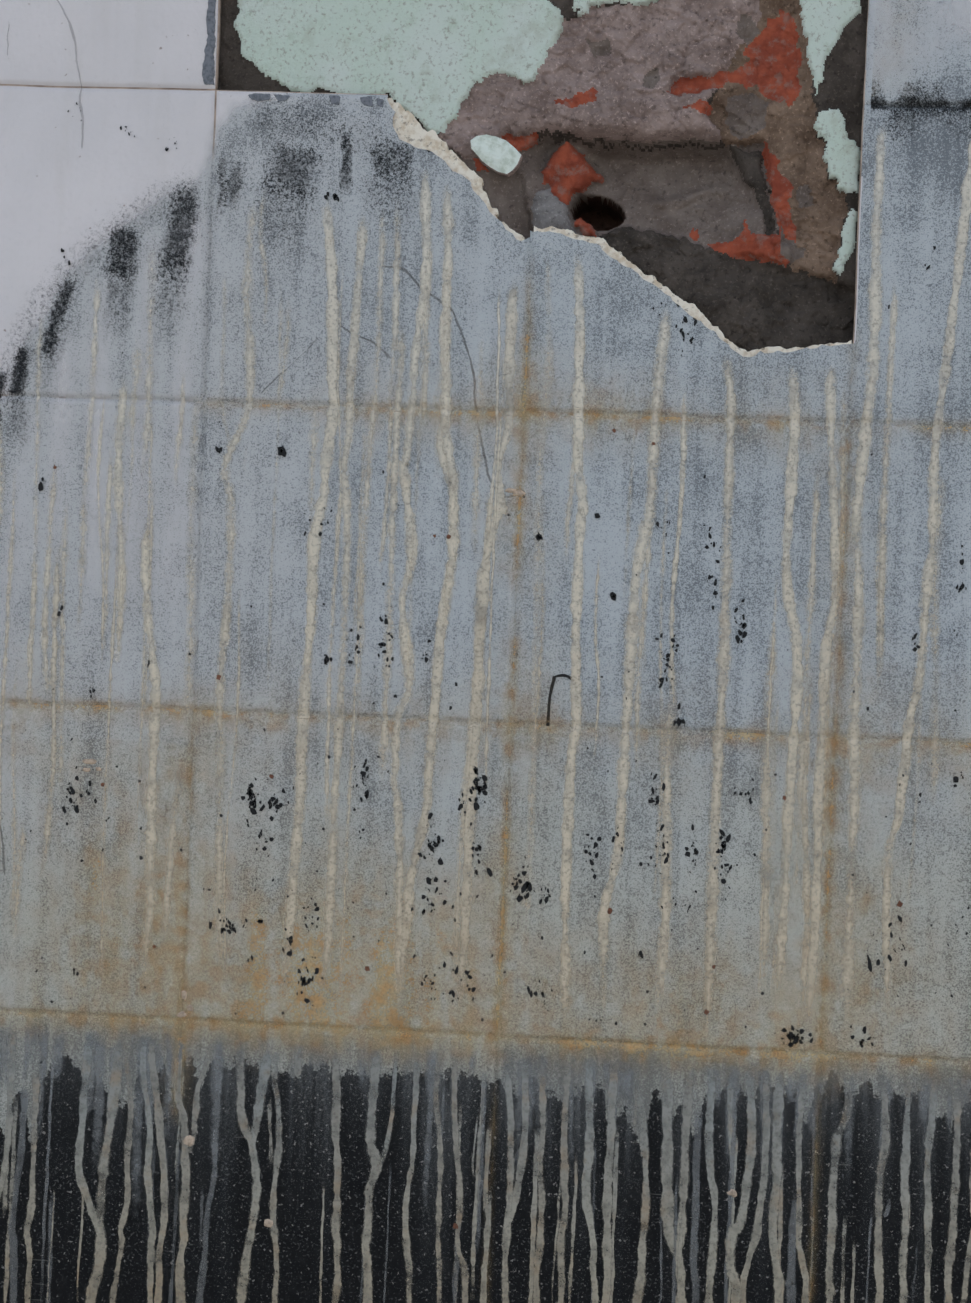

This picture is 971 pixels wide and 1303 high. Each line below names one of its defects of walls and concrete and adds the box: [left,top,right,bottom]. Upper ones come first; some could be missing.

spalling [202,0,868,357]
corrosion [238,915,432,1039]
corrosion [560,1040,835,1062]
water stain [110,1249,123,1303]
water stain [118,1152,131,1248]
water stain [362,1092,382,1303]
water stain [538,1182,546,1217]
water stain [554,1221,566,1303]
water stain [581,1106,599,1303]
water stain [690,1172,700,1289]
water stain [877,1124,890,1175]
water stain [944,1188,958,1303]